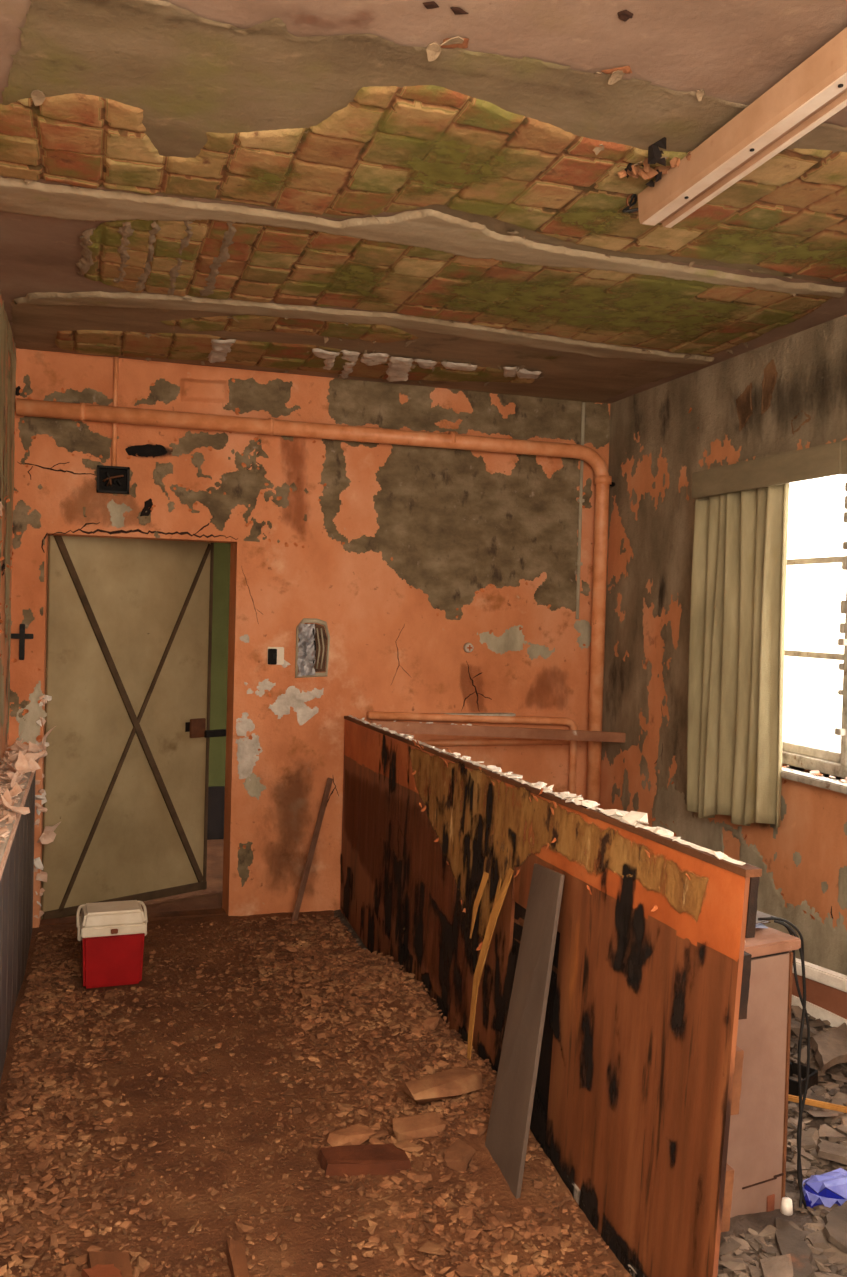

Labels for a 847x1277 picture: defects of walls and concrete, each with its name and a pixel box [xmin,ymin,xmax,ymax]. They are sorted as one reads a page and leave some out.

flaking render [0,85,847,976]